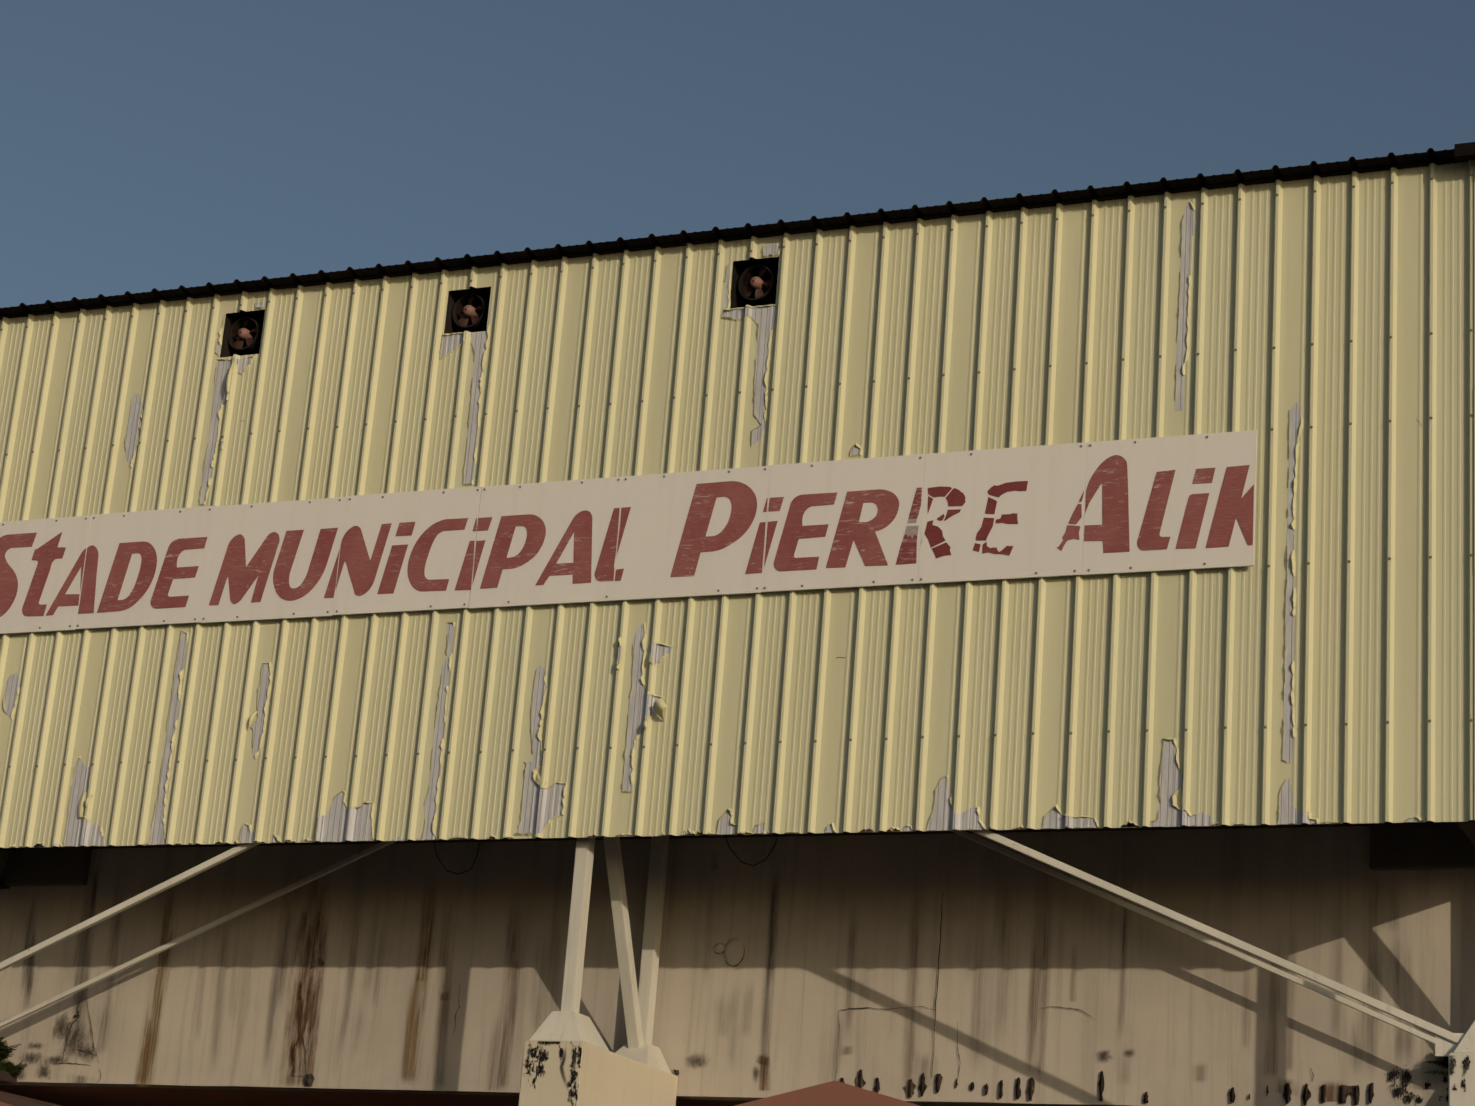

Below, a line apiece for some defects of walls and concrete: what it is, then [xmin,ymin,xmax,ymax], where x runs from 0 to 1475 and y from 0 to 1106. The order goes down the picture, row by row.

peeling [199,314,257,506]
peeling [439,324,490,486]
peeling [720,263,778,447]
peeling [1276,402,1340,825]
peeling [10,756,104,848]
peeling [215,621,568,844]
peeling [616,622,674,794]
peeling [859,775,991,832]
peeling [1012,804,1099,829]
peeling [1121,737,1248,828]
leakage [18,1018,93,1077]
corrosion [288,914,325,1083]